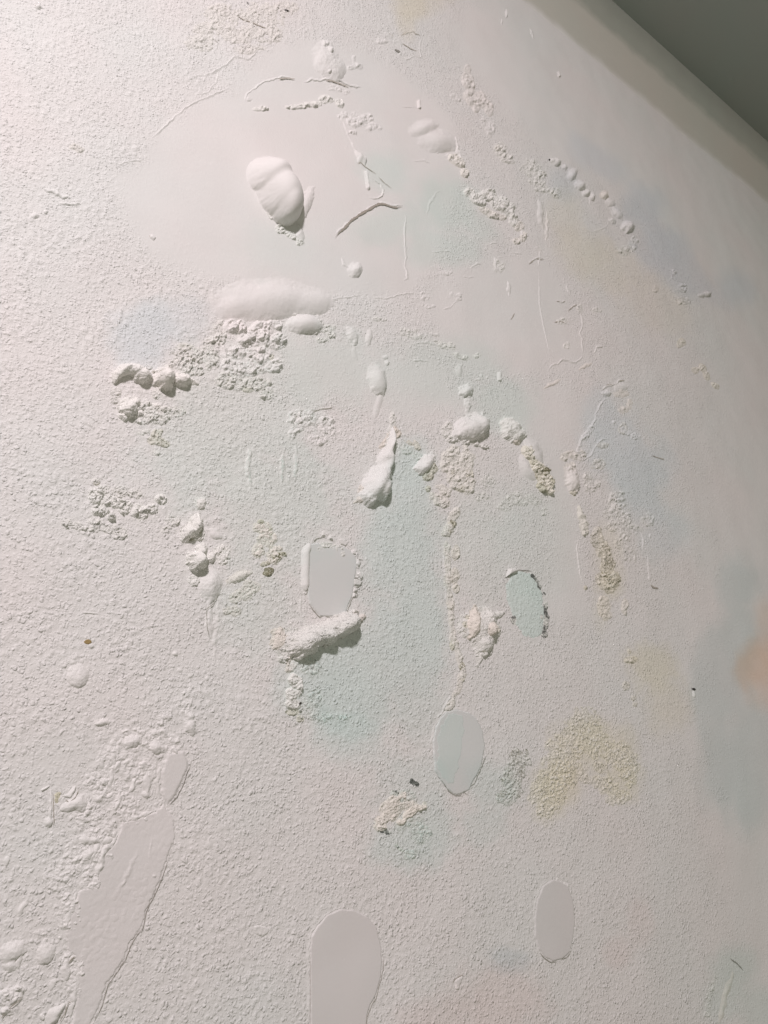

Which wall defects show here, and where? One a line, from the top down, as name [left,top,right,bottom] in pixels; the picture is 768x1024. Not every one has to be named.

peeling [301,531,363,617]
peeling [505,568,549,638]
peeling [39,650,209,1024]
flaking render [0,985,25,1018]